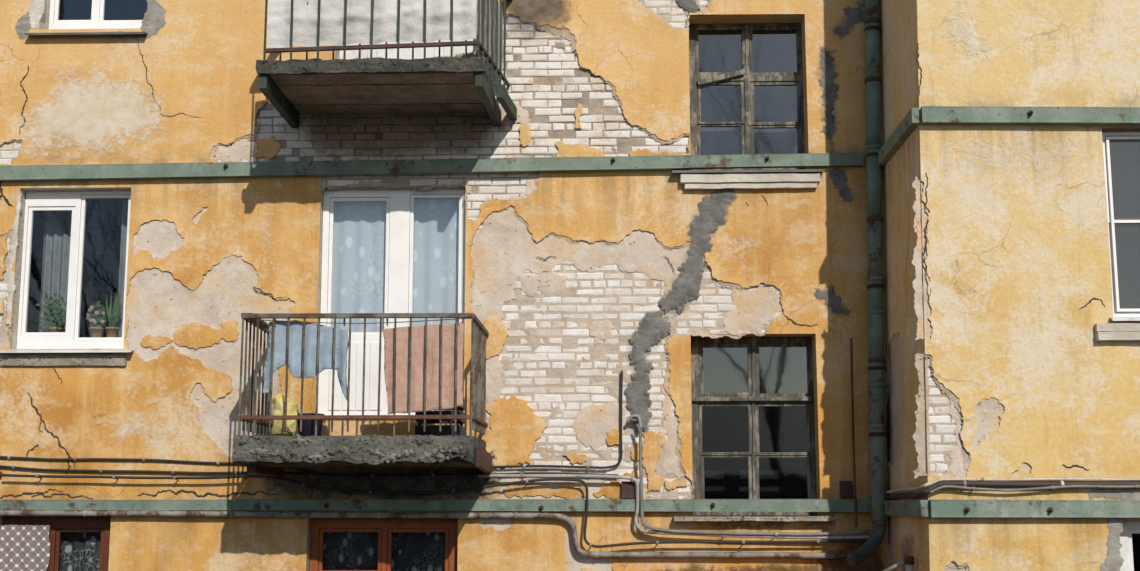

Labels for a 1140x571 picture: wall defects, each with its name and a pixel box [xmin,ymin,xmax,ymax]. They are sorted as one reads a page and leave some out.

damp [507,0,569,34]
crack [676,0,700,15]
crack [19,65,29,135]
crack [138,40,195,118]
flaking render [210,12,690,162]
crack [818,0,865,203]
flaking render [0,229,17,348]
flaking render [125,172,784,499]
crack [624,189,768,432]
flaking render [888,176,1004,479]
crack [0,393,92,499]
flaking render [944,561,969,571]